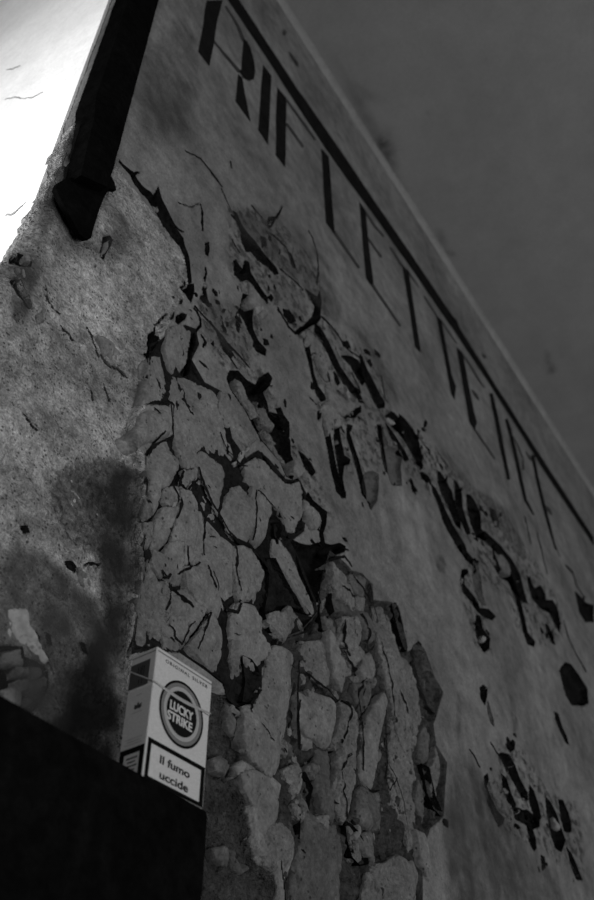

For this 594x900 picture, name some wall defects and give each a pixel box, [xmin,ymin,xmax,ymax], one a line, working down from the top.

peeling [0,607,53,707]
peeling [52,204,594,900]